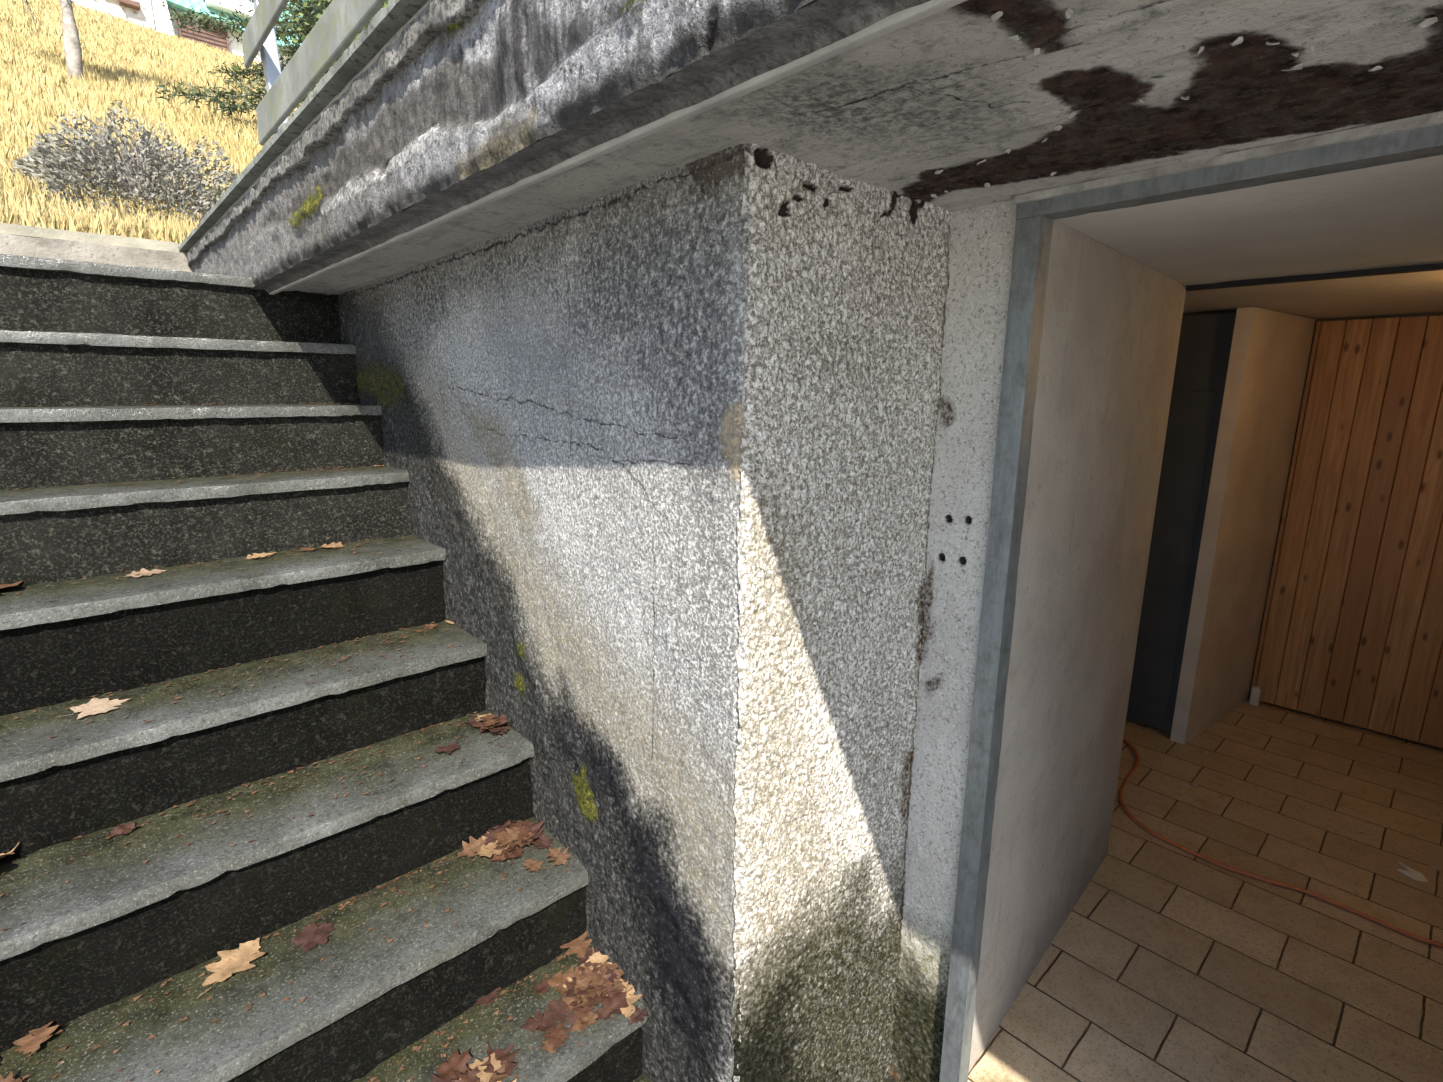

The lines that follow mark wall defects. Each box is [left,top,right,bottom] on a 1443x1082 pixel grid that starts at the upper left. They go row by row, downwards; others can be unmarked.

leakage [322,106,445,213]
spalling [778,181,853,217]
peeling [901,0,1443,203]
crack [444,270,696,759]
leakage [338,182,742,1082]